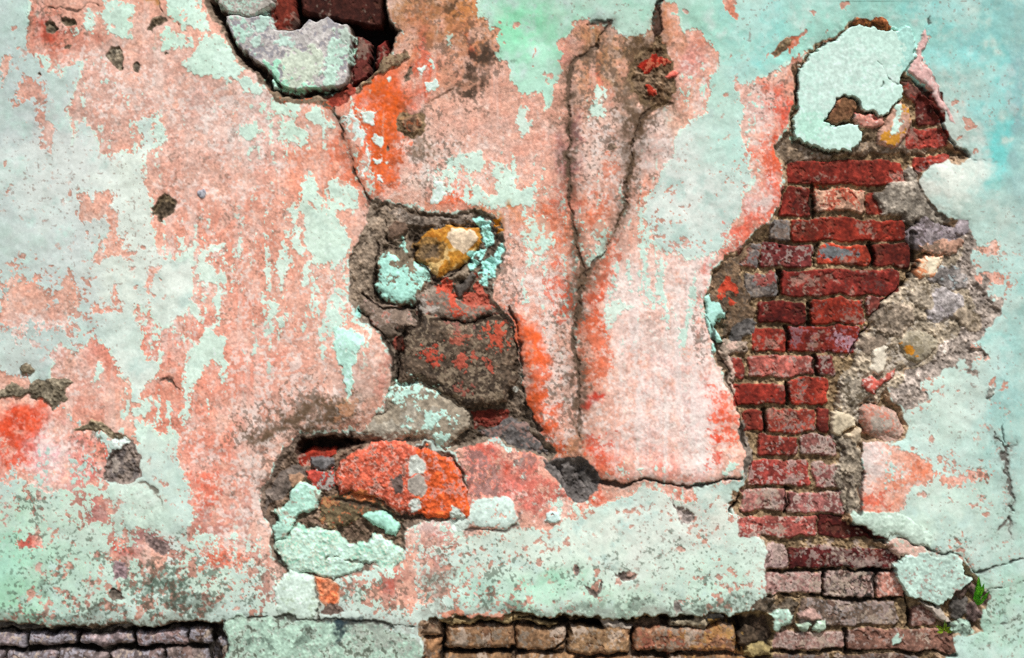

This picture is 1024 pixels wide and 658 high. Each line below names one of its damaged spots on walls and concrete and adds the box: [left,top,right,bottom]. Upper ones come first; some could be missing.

crack [651,0,665,42]
peeling [0,0,557,618]
crack [565,18,656,442]
spalling [366,0,1011,658]
crack [599,477,744,491]
crack [922,424,1024,593]
spalling [0,620,229,658]
crack [999,618,1022,626]